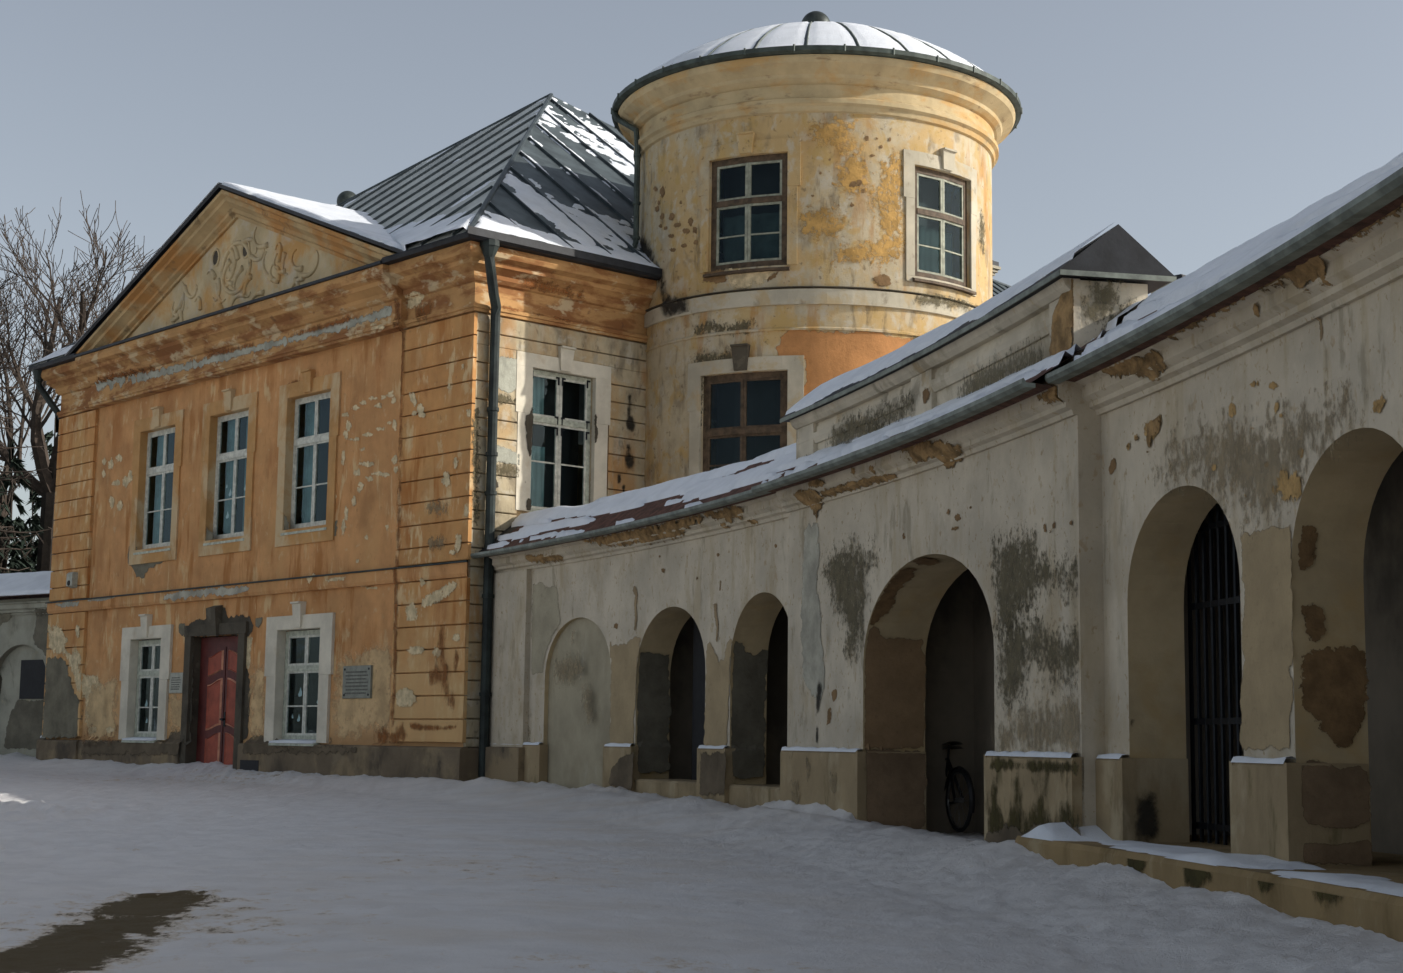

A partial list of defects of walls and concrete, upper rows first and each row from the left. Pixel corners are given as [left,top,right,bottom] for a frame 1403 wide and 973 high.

peeling [800,115,906,268]
peeling [334,390,426,536]
peeling [4,597,116,750]
peeling [396,687,417,708]
peeling [405,579,457,621]
flaking render [525,553,564,565]
leakage [822,533,880,664]
leakage [990,525,1079,712]
peeling [1240,525,1369,751]